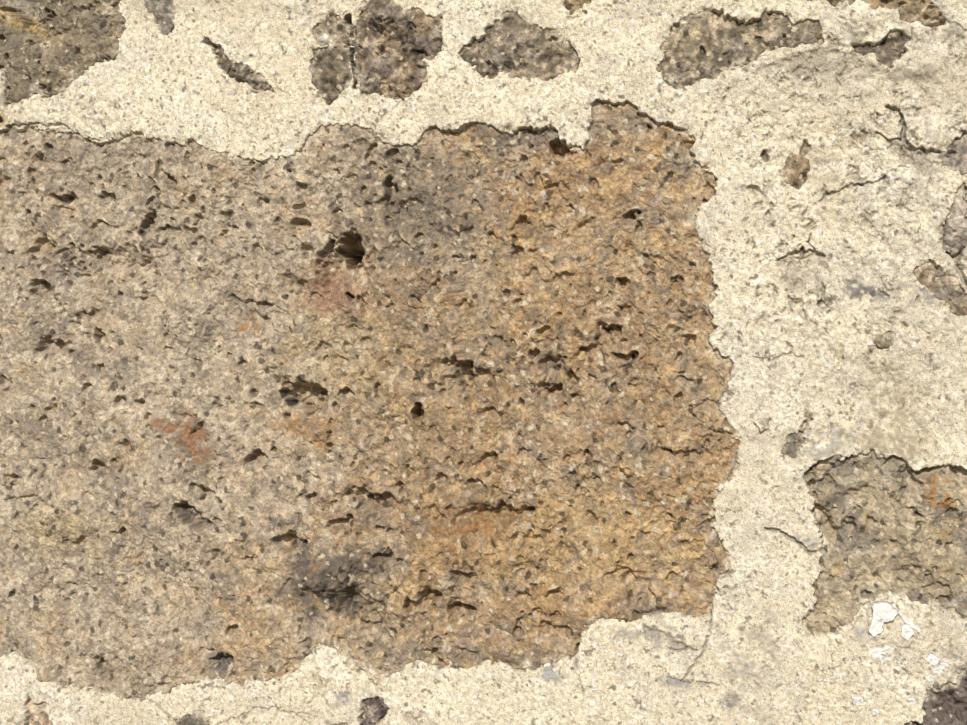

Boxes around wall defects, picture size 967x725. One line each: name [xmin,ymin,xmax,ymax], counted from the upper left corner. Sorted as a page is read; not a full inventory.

crack [944,15,967,32]
crack [877,104,946,157]
spalling [48,191,78,209]
spalling [382,174,402,226]
spalling [623,208,642,223]
crack [819,176,886,203]
spalling [24,277,63,305]
spalling [600,324,637,363]
peeling [449,350,507,427]
spalling [269,533,310,554]
spalling [415,585,477,634]
peeling [852,599,921,664]